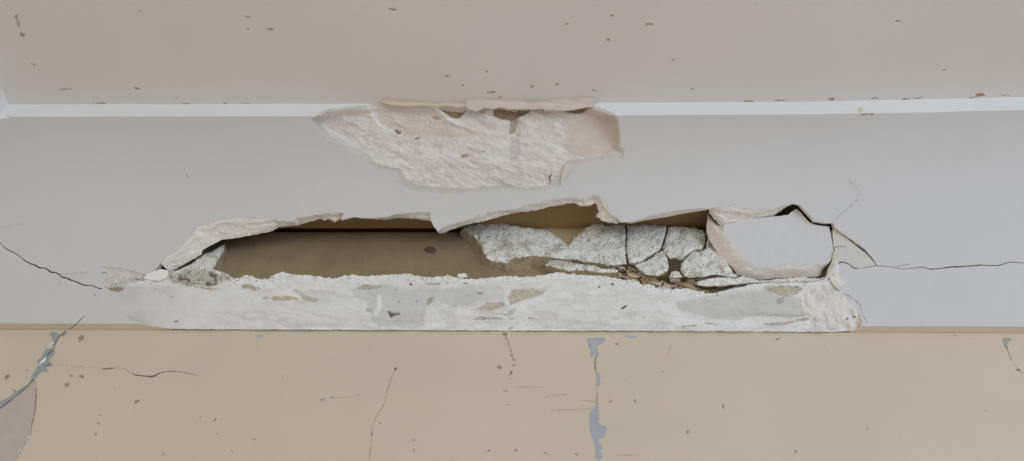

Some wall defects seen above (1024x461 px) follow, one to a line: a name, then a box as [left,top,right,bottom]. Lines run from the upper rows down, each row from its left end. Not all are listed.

crack [0,242,107,289]
spalling [102,98,860,386]
crack [619,246,852,280]
peeling [0,331,67,461]
peeling [589,401,607,461]